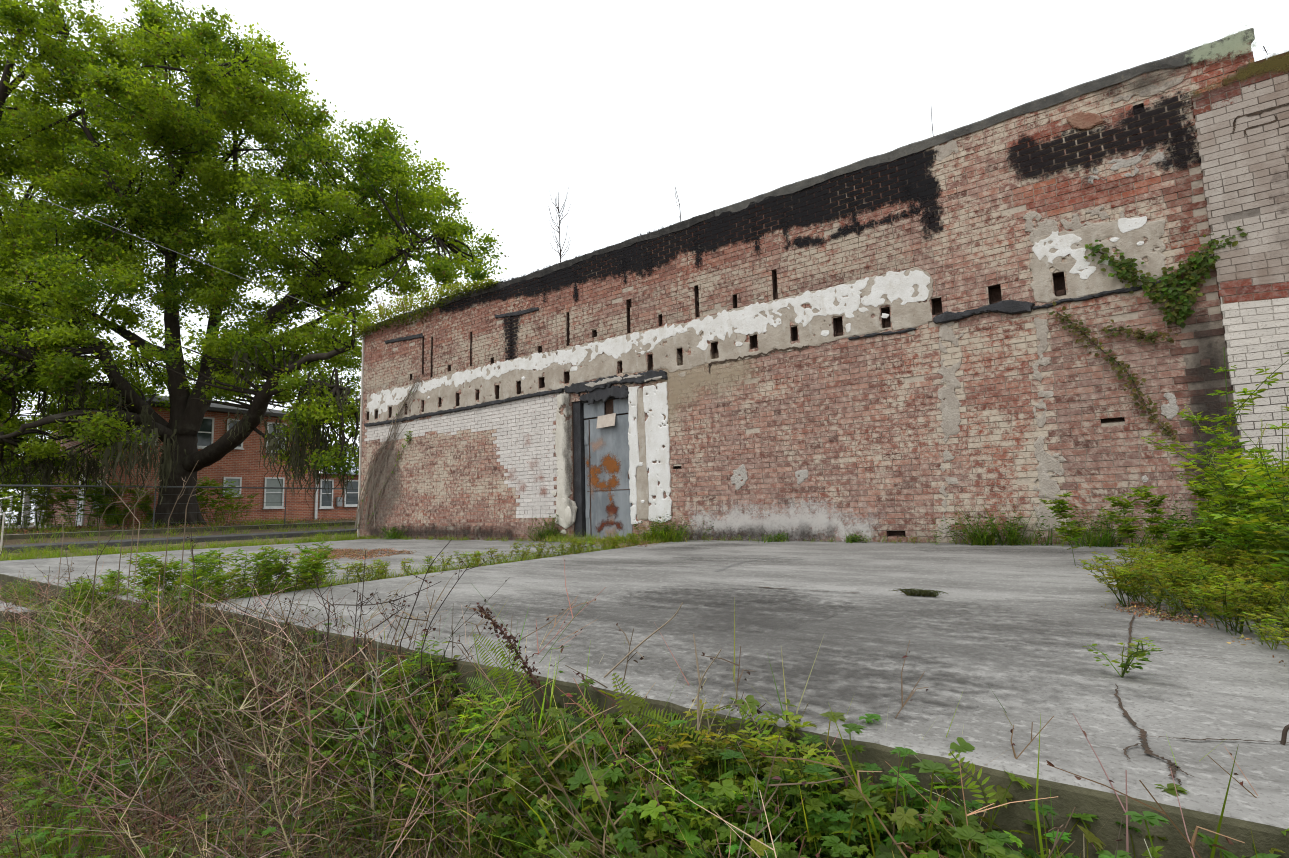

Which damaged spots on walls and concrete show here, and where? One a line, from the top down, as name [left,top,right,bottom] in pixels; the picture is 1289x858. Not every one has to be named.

leakage [919,180,944,239]
peeling [1124,152,1173,177]
peeling [1029,205,1166,427]
peeling [366,267,964,539]
corrosion [585,454,623,533]
crack [1114,615,1289,785]